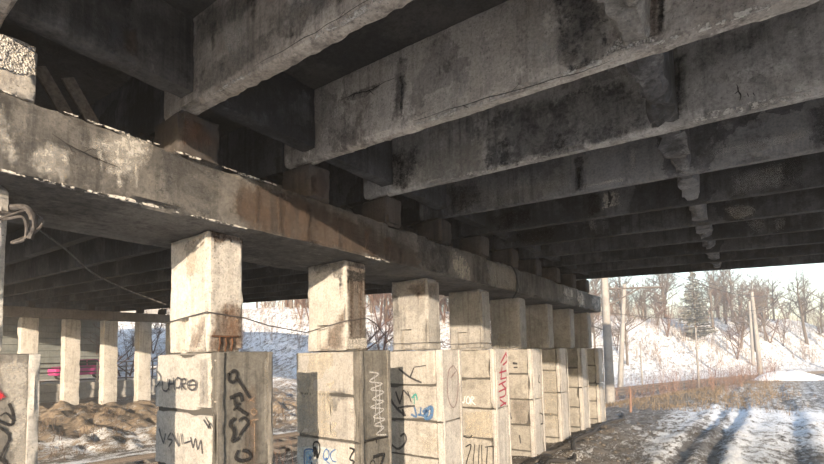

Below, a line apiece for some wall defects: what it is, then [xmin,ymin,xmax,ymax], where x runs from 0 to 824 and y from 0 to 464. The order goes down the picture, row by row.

spalling [0,34,36,76]
crack [255,0,367,66]
leakage [554,0,607,70]
spalling [529,4,771,88]
leakage [394,76,406,113]
crack [415,61,609,121]
leakage [486,83,646,170]
rust [209,305,243,351]